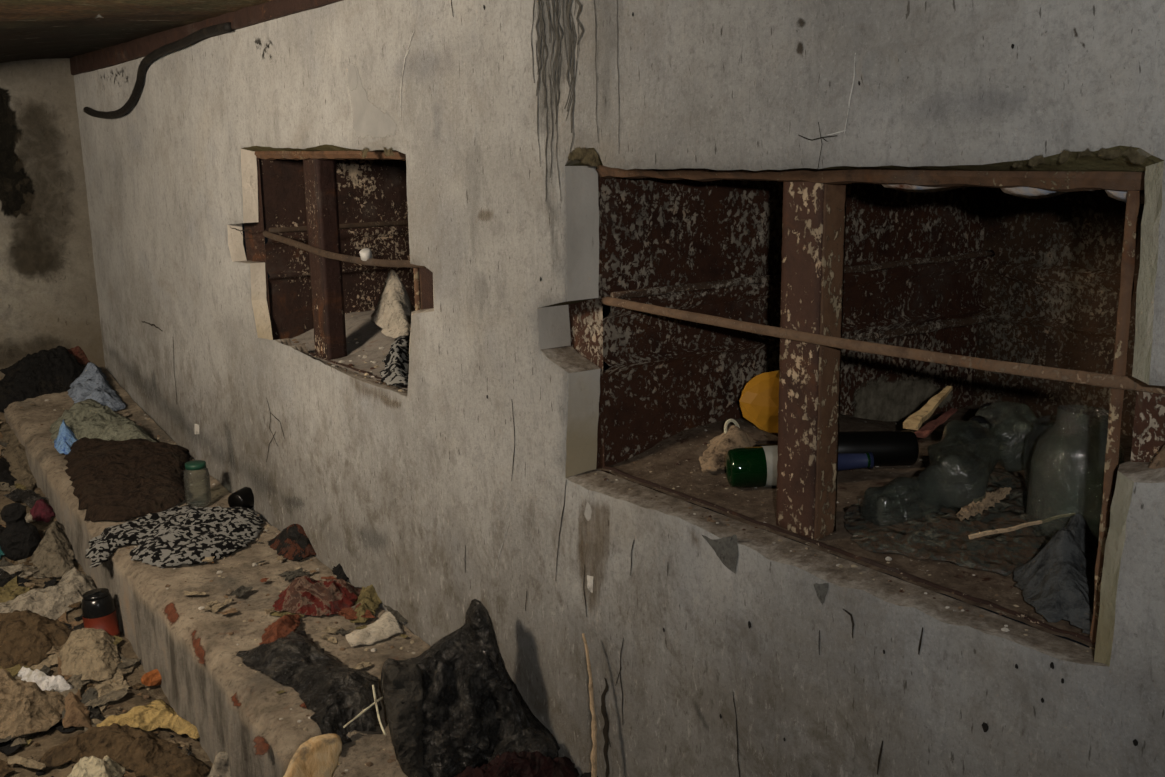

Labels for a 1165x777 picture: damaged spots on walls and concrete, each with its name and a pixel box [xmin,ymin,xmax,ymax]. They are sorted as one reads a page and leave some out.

peeling [0,88,34,218]